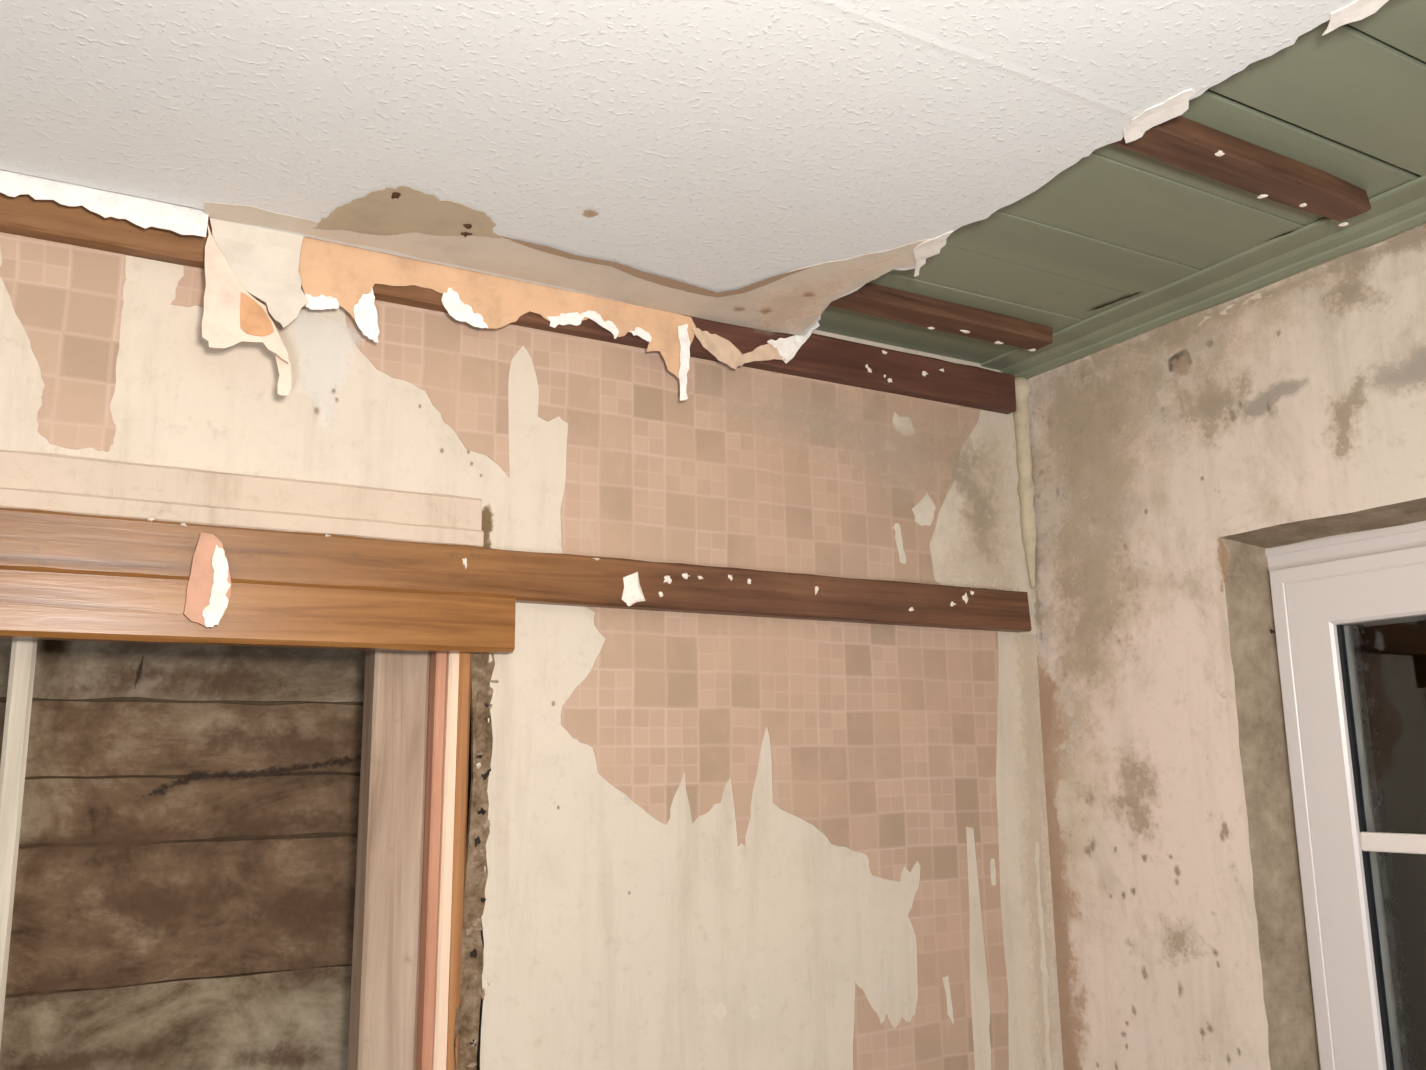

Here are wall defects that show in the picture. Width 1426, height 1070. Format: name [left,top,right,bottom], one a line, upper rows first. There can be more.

peeling [201,218,820,401]
water stain [1041,225,1426,685]
flaking render [454,653,499,1070]
water stain [1114,759,1155,833]